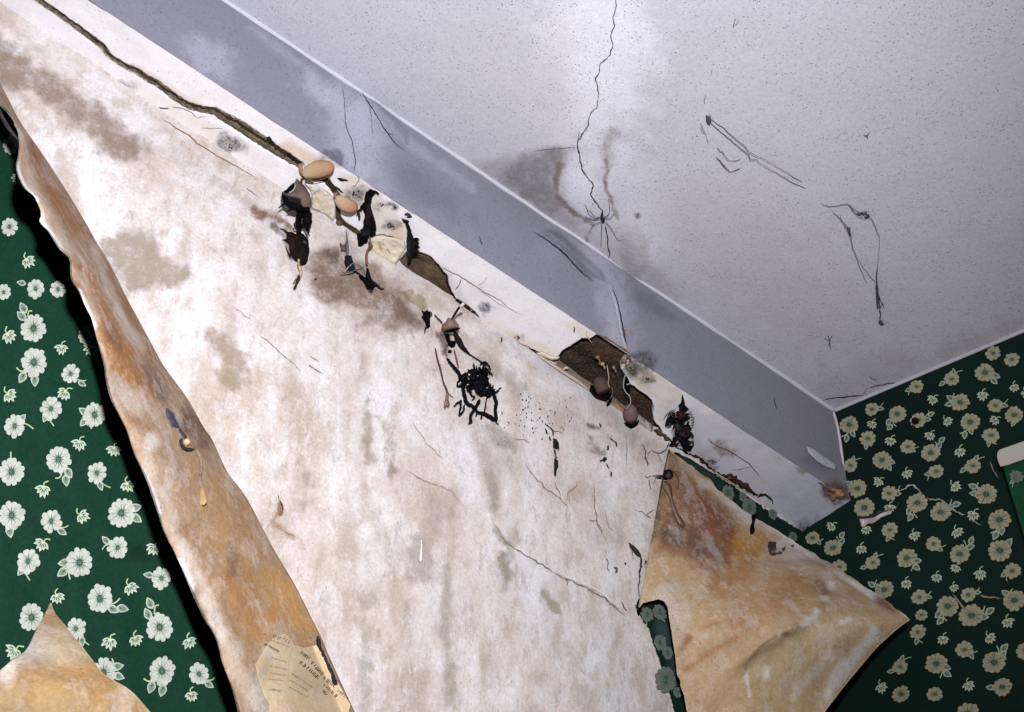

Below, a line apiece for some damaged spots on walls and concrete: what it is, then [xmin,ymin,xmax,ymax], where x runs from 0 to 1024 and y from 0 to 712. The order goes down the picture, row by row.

leakage [0,48,139,160]
crack [36,0,403,234]
mould [218,136,241,151]
leakage [510,163,589,222]
crack [538,0,617,258]
leakage [312,247,426,327]
spalling [369,234,479,317]
peeling [0,84,355,712]
crack [494,468,627,614]
peeling [537,335,910,712]